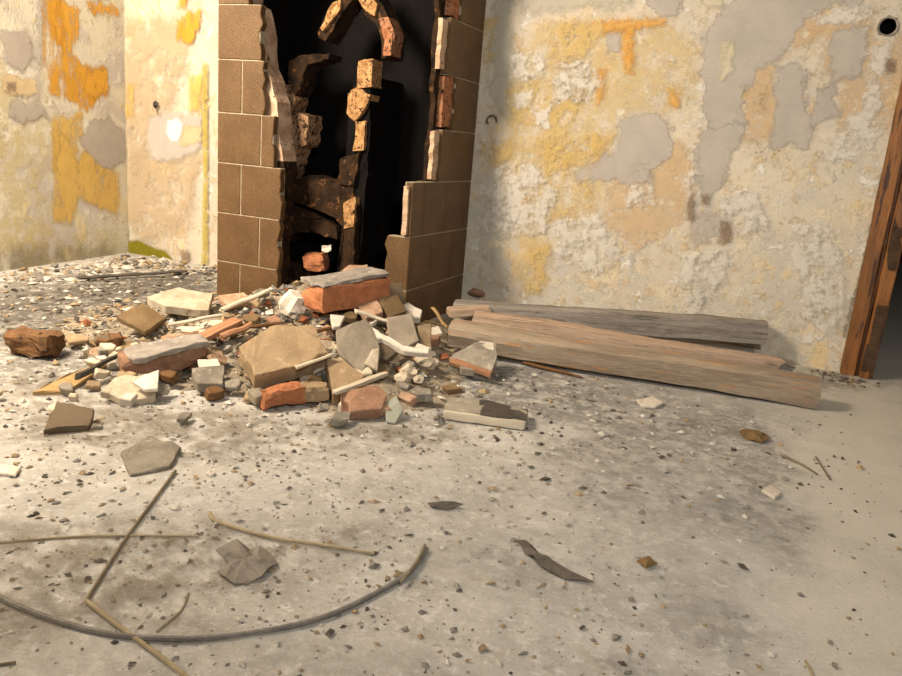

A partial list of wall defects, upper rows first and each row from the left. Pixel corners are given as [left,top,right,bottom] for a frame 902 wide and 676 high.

peeling [0,0,125,171]
flaking render [147,112,202,161]
peeling [605,30,621,53]
peeling [574,112,674,206]
peeling [680,0,899,314]
flaking render [478,163,621,274]
flaking render [788,219,862,337]